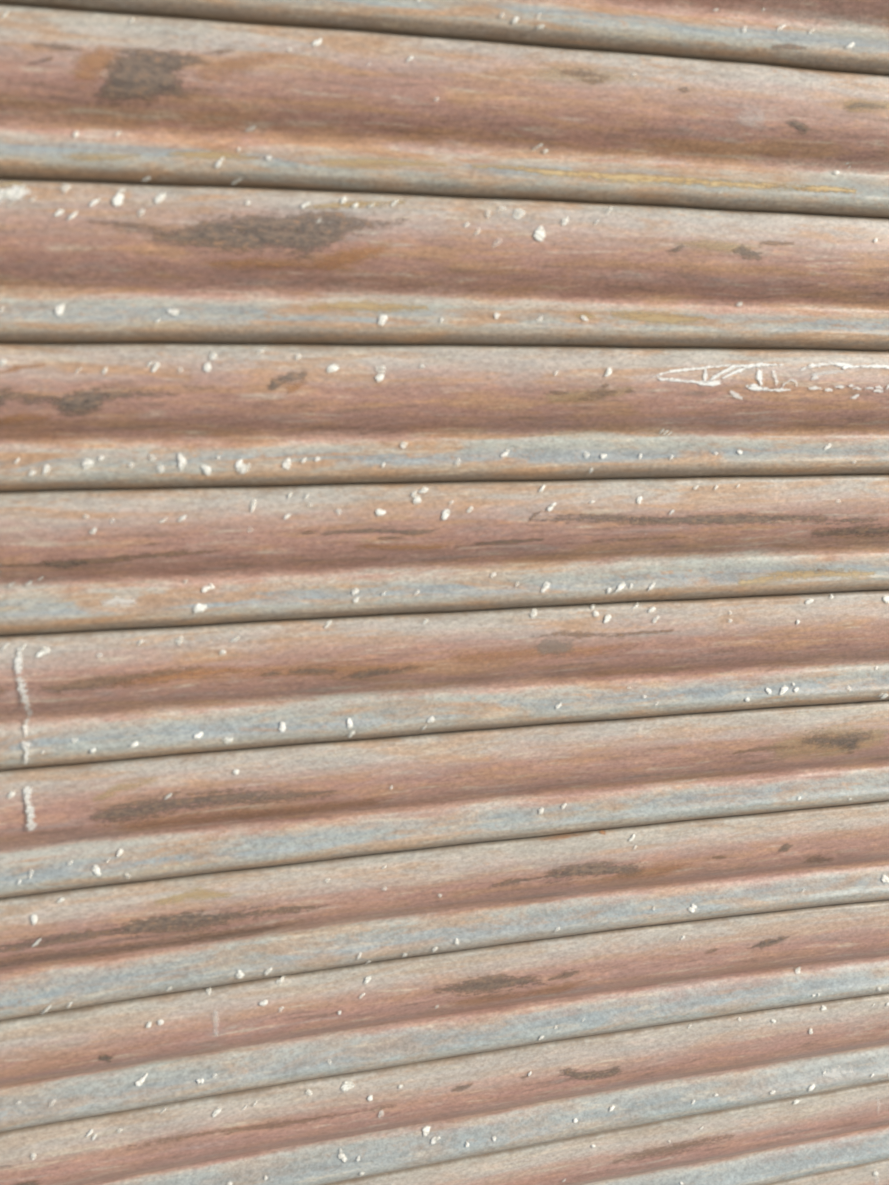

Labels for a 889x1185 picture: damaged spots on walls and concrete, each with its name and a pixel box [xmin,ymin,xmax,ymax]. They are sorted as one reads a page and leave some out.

rust [76,48,233,107]
rust [153,201,403,270]
rust [0,385,173,424]
rust [803,728,873,754]
rust [92,788,361,827]
rust [493,861,644,887]
rust [0,889,323,952]
rust [436,971,578,997]